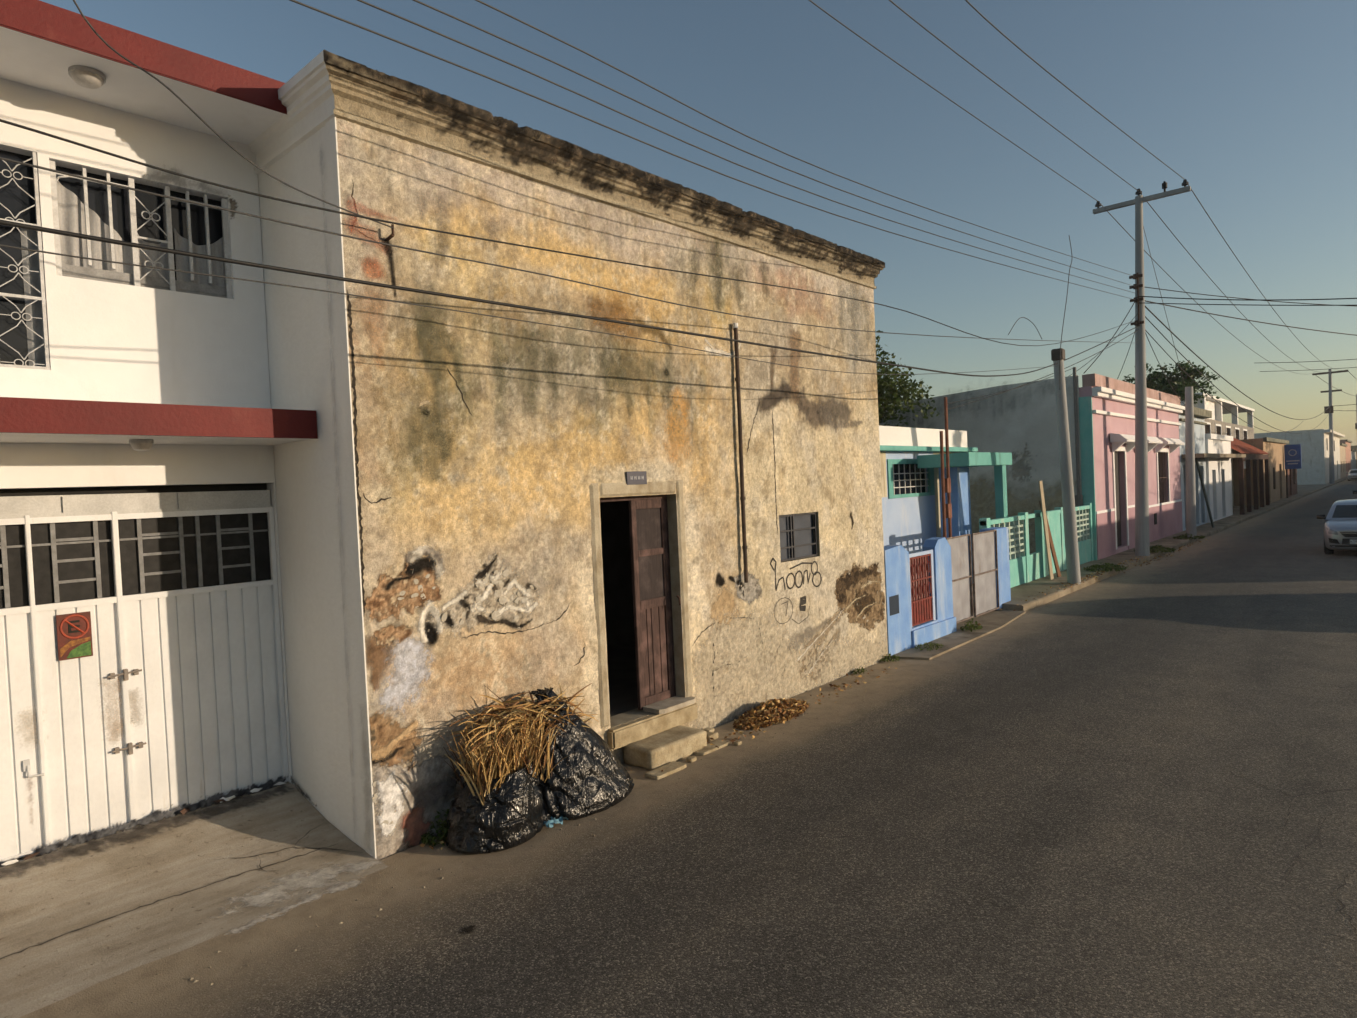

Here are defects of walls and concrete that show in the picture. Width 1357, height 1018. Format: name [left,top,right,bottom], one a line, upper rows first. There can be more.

damp [639,322,672,349]
damp [759,332,862,428]
peeling [364,546,538,647]
spalling [798,562,885,679]